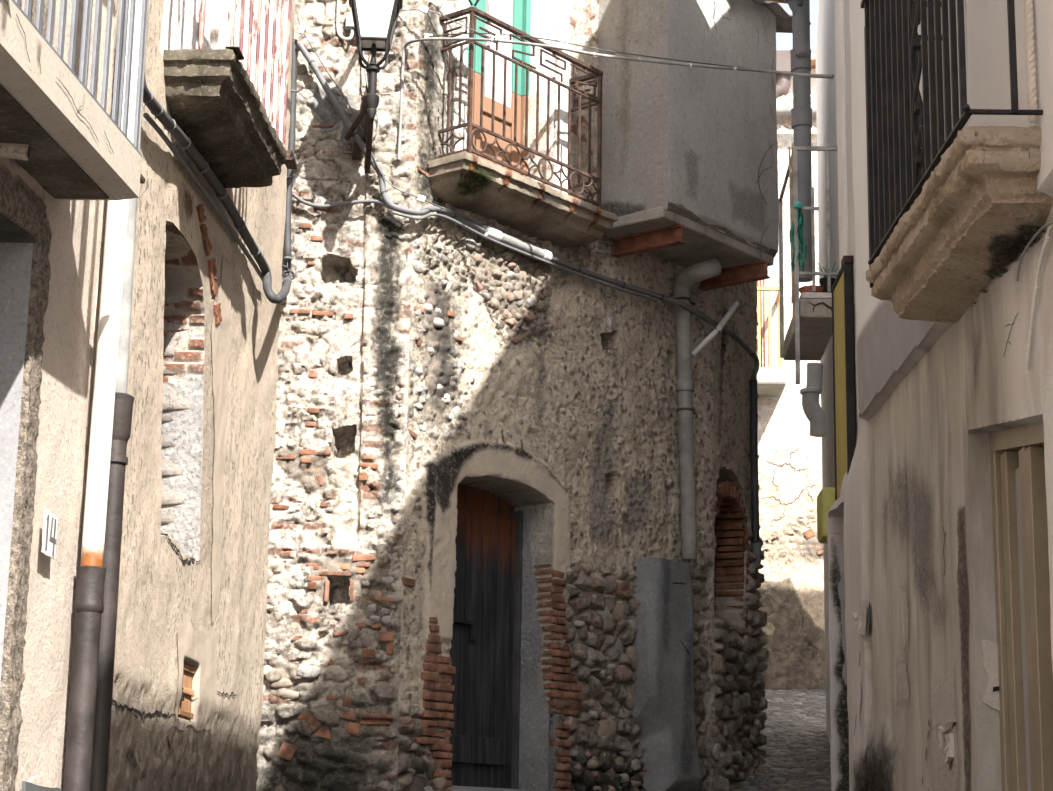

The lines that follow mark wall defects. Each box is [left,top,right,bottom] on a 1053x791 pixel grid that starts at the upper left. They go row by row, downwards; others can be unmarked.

crack [16,14,114,154]
spalling [196,204,222,324]
mould [973,225,1047,304]
damp [371,210,403,511]
mould [426,443,532,572]
crack [112,699,179,723]
damp [830,548,889,791]